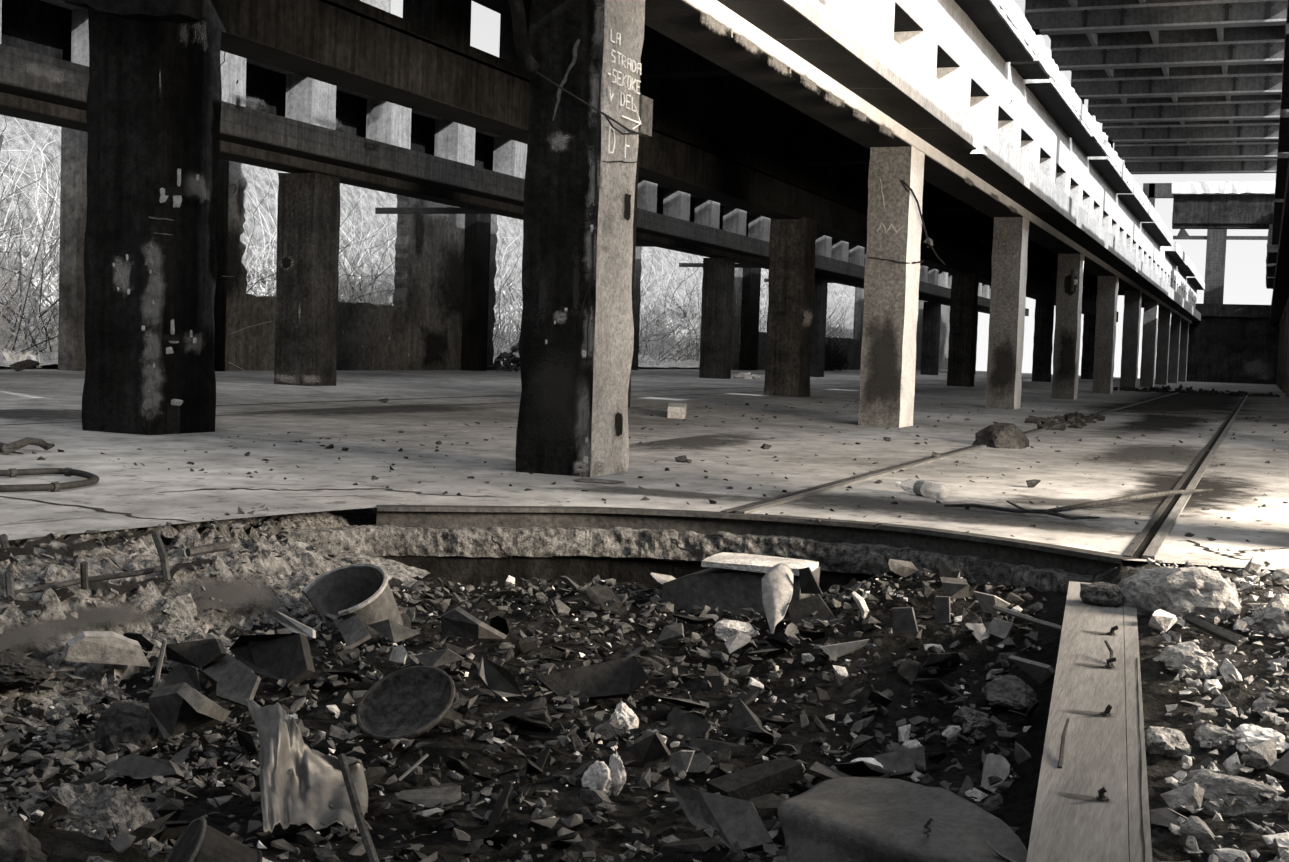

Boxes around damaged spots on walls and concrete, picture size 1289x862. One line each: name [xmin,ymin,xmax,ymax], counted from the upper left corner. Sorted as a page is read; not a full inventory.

spalling [113,243,165,416]